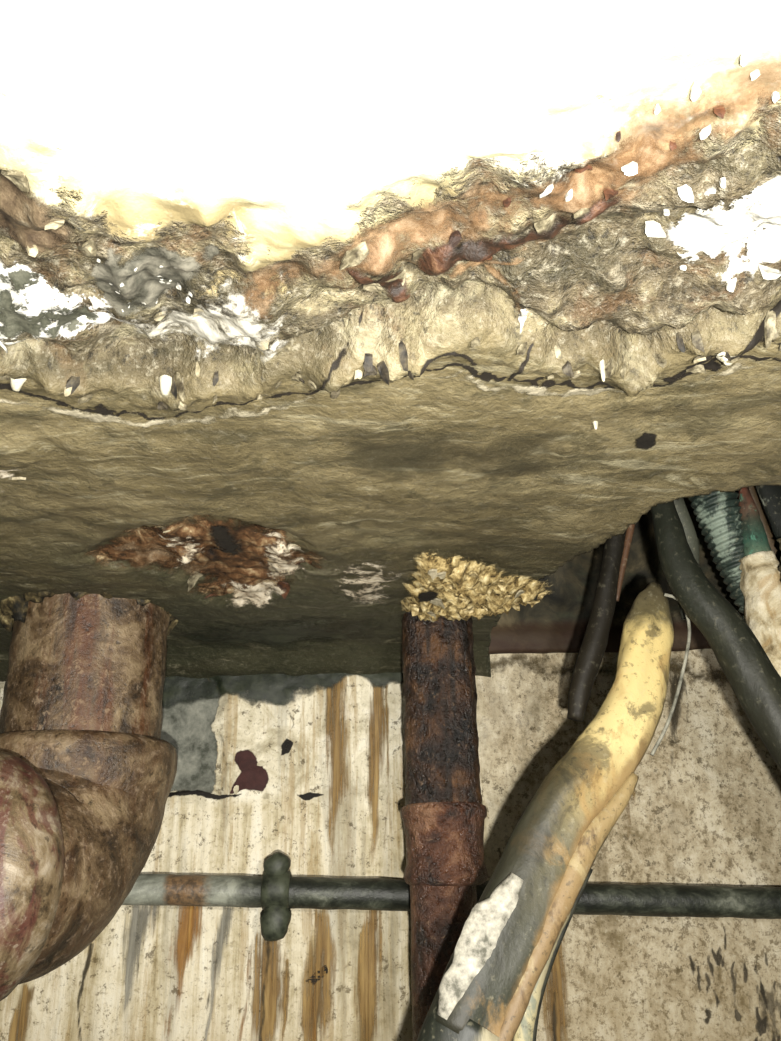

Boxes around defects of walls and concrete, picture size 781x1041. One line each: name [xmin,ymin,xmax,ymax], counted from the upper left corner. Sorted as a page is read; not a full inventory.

peeling [0,170,120,353]
water stain [92,245,286,359]
spalling [339,186,621,303]
rust [247,55,781,314]
spalling [518,309,528,331]
peeling [645,177,781,292]
spalling [86,515,323,608]
rust [174,906,202,997]
water stain [689,929,781,1041]